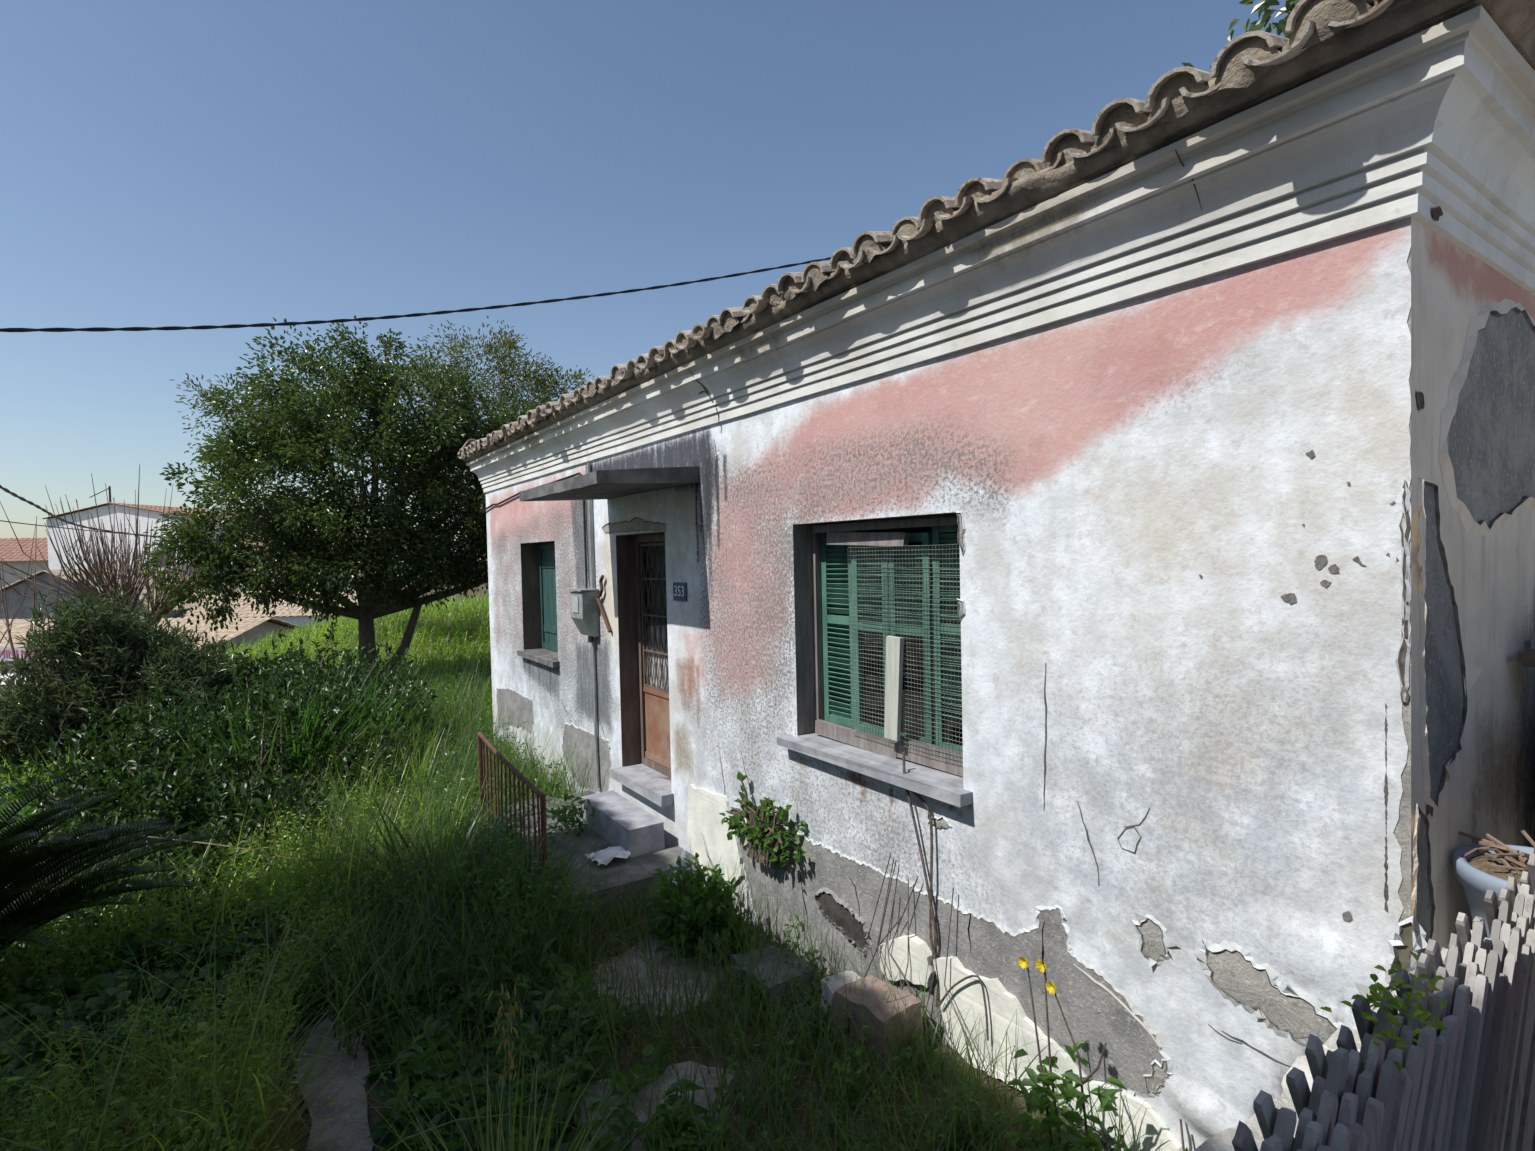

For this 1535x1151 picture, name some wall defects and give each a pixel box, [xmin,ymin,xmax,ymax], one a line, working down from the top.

damp [572,500,591,586]
damp [585,429,727,584]
flaking render [1280,593,1297,605]
flaking render [1314,555,1367,588]
flaking render [1354,298,1535,1013]
crack [1043,663,1150,886]
crack [1382,703,1390,912]
flaking render [687,784,1182,1151]
flaking render [1132,913,1347,1046]